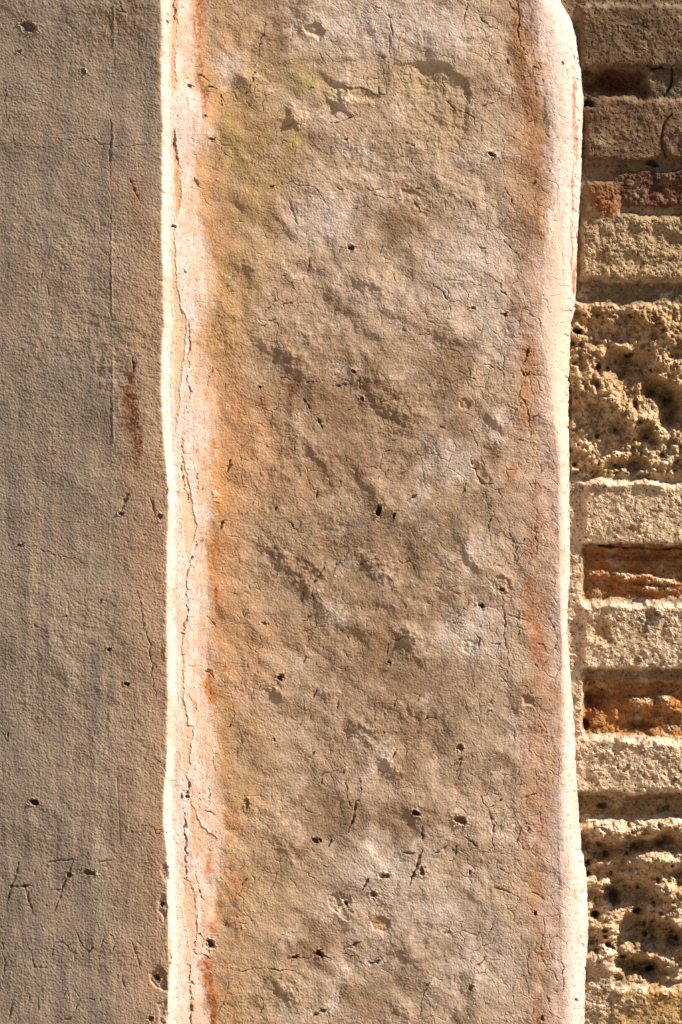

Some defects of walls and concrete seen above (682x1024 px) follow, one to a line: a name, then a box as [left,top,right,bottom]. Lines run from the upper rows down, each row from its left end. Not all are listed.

crack [458,0,543,142]
rust [120,363,145,471]
crack [162,321,214,503]
crack [431,348,550,497]
rust [204,437,230,609]
crack [180,539,204,640]
rust [202,661,229,709]
crack [450,594,554,673]
crack [141,706,238,901]
rust [203,849,214,879]
rust [196,956,220,1024]
crack [168,932,361,1024]